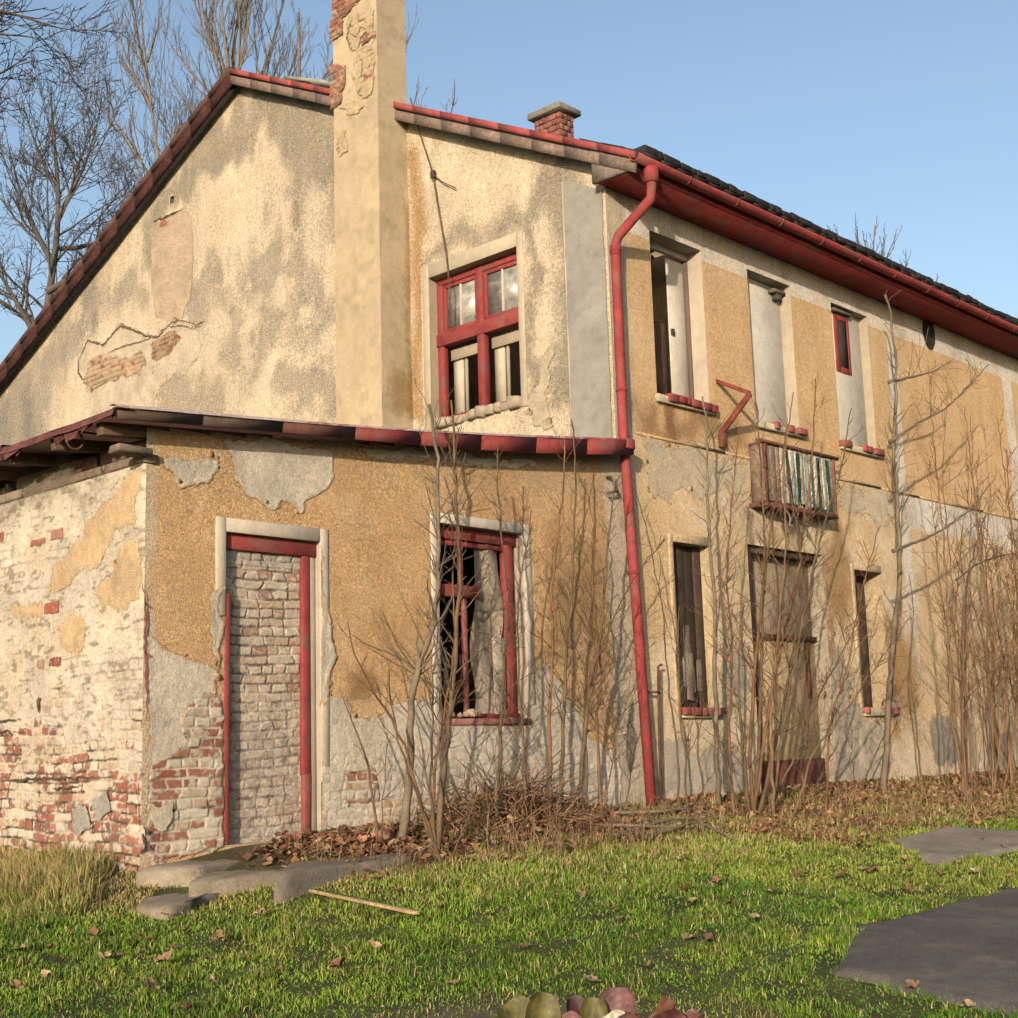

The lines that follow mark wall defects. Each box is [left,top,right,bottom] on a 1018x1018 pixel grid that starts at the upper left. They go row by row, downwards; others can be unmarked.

spalling [328,0,376,110]
water stain [145,90,334,245]
water stain [0,290,97,445]
spalling [78,317,202,417]
crack [77,319,204,390]
water stain [159,371,224,413]
water stain [242,241,333,384]
water stain [276,363,336,415]
peeling [162,436,334,514]
peeling [11,465,142,670]
spalling [0,583,226,871]
peeling [319,545,637,844]